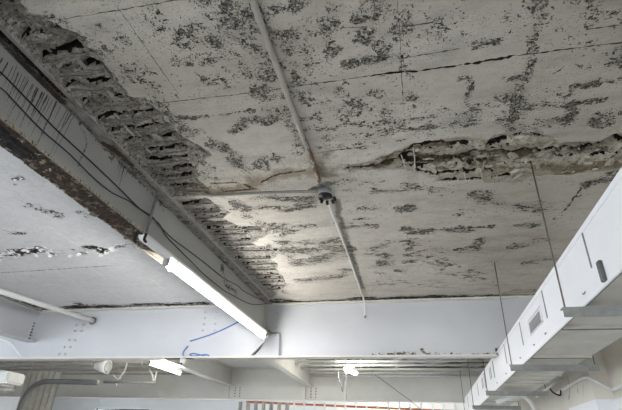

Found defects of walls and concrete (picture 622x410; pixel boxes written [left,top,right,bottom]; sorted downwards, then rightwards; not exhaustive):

crack [54,0,622,104]
spalling [0,0,622,299]
corrosion [302,138,321,184]
damp [408,141,534,163]